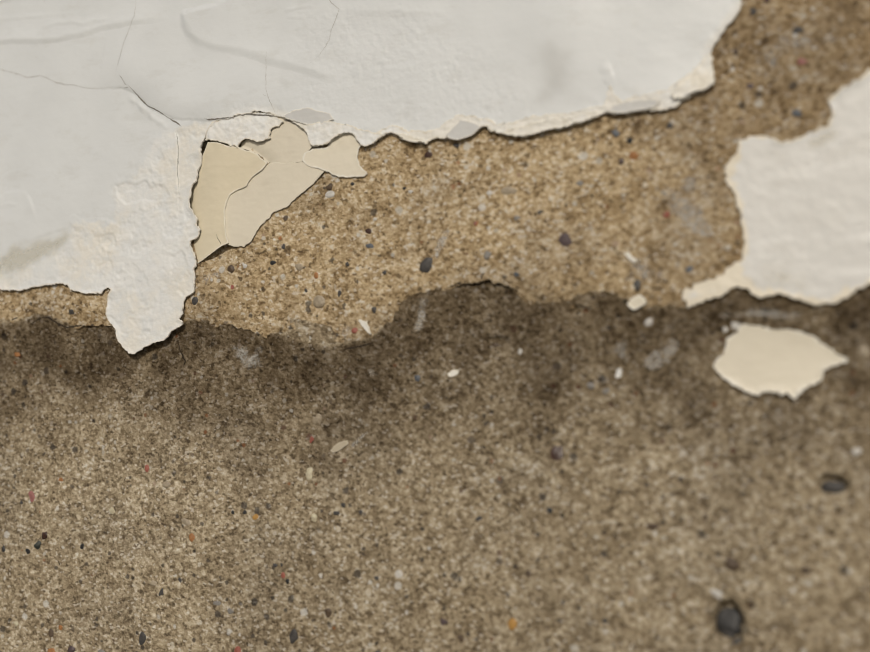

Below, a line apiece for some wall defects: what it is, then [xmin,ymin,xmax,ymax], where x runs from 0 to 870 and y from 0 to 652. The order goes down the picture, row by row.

crack [0,5,180,187]
crack [208,91,294,124]
peeling [0,0,870,354]
peeling [713,324,847,399]